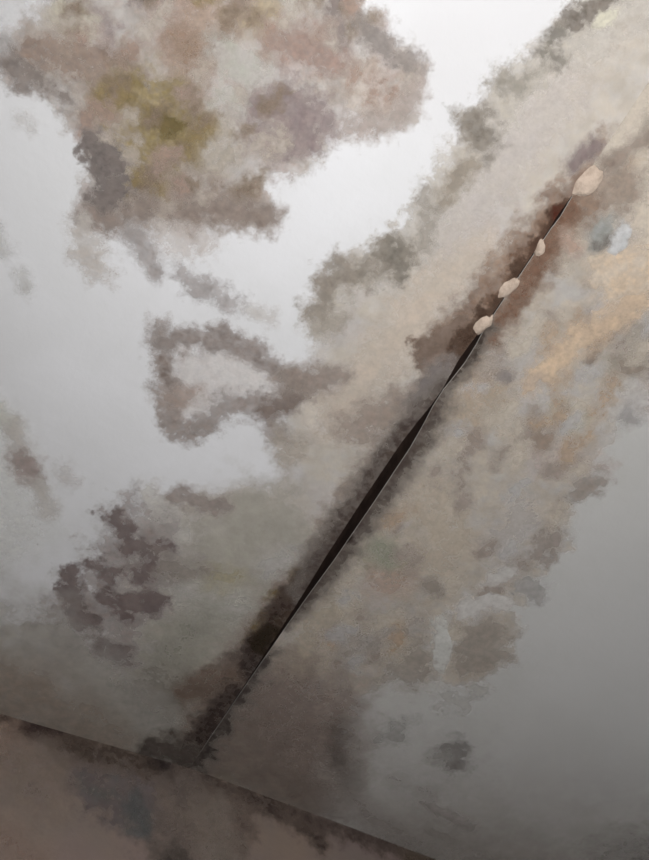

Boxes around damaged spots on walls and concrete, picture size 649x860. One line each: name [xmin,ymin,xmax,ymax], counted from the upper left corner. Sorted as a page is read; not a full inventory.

leakage [0,0,429,466]
leakage [301,0,631,342]
crack [517,196,572,278]
leakage [0,324,499,860]
crack [214,333,482,731]